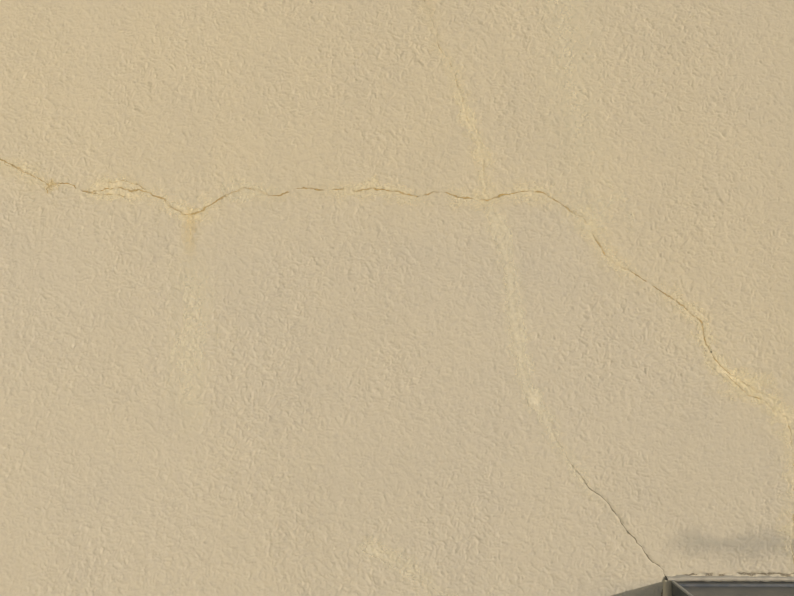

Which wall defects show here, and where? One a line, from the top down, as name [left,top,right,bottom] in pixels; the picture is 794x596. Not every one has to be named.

crack [31,175,429,218]
crack [448,188,605,255]
crack [632,272,794,433]